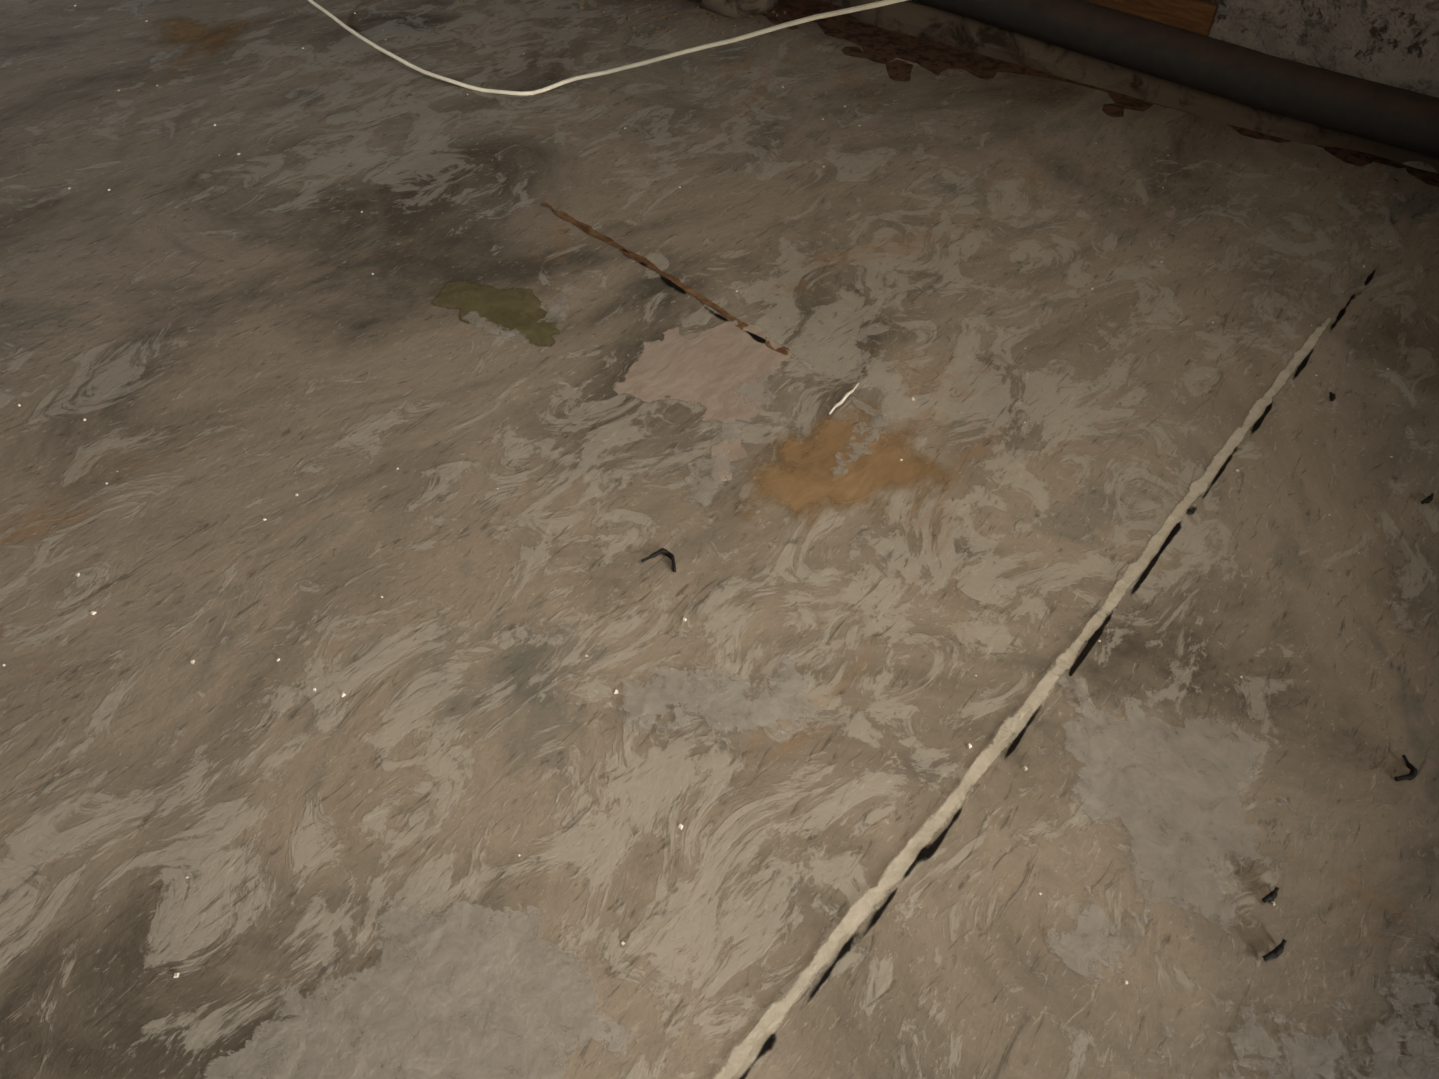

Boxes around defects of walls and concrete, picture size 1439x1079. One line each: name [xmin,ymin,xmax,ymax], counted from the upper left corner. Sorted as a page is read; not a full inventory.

crack [541,203,790,355]
crack [713,270,1375,1079]